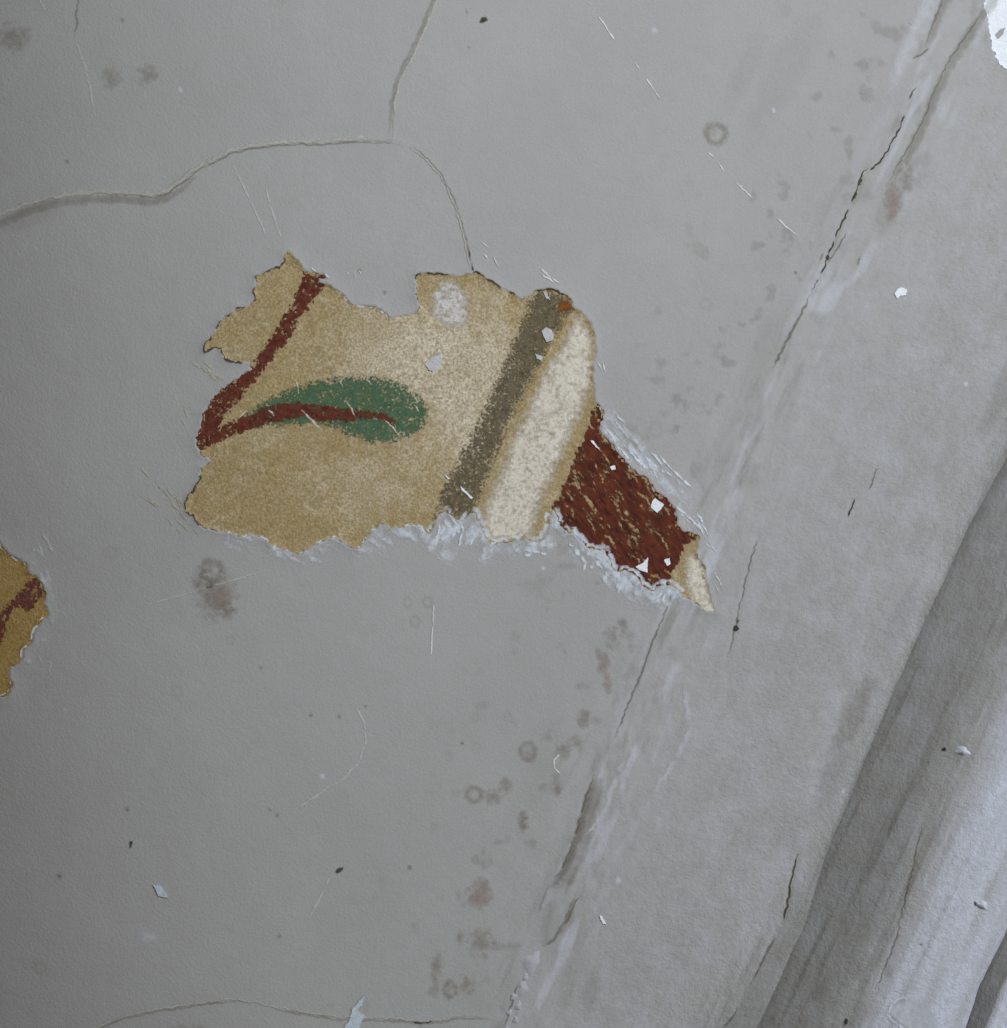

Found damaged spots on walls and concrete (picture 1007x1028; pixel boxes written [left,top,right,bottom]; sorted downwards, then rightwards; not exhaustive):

crack [0,0,438,216]
peeling [984,0,1007,69]
peeling [159,252,721,611]
peeling [0,544,48,697]